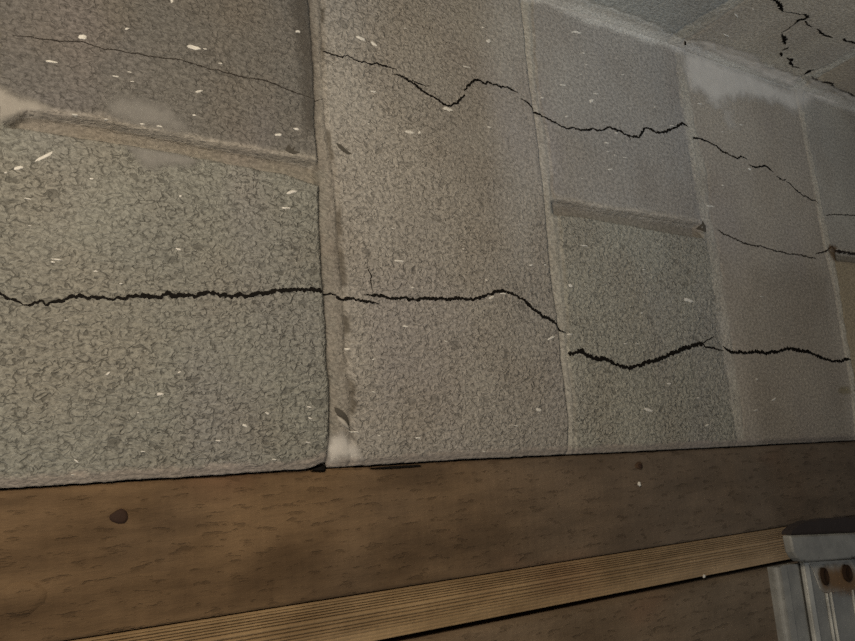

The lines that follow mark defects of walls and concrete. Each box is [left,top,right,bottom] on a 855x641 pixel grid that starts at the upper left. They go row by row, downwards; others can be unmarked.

leakage [684,52,839,111]
crack [773,0,855,97]
crack [323,51,855,216]
crack [719,230,855,259]
crack [0,265,851,372]
spalling [334,407,349,429]